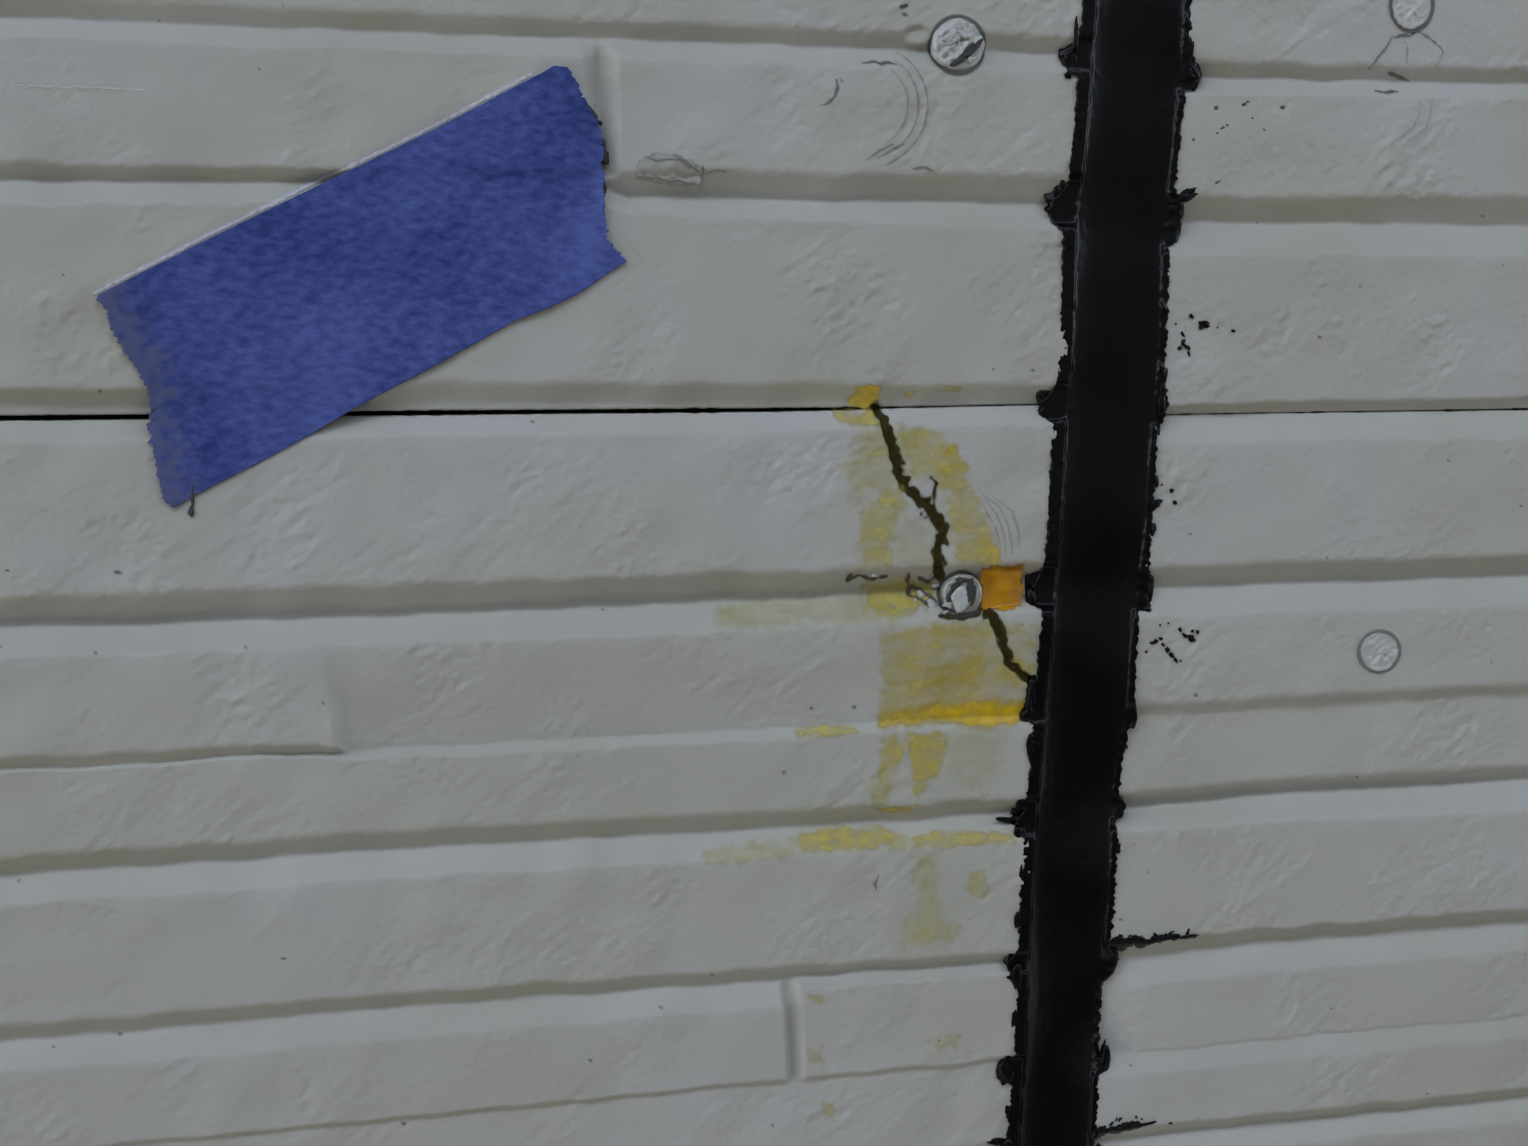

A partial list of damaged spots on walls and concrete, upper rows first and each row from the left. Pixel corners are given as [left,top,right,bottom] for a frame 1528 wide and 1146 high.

crack [870,404,1030,684]